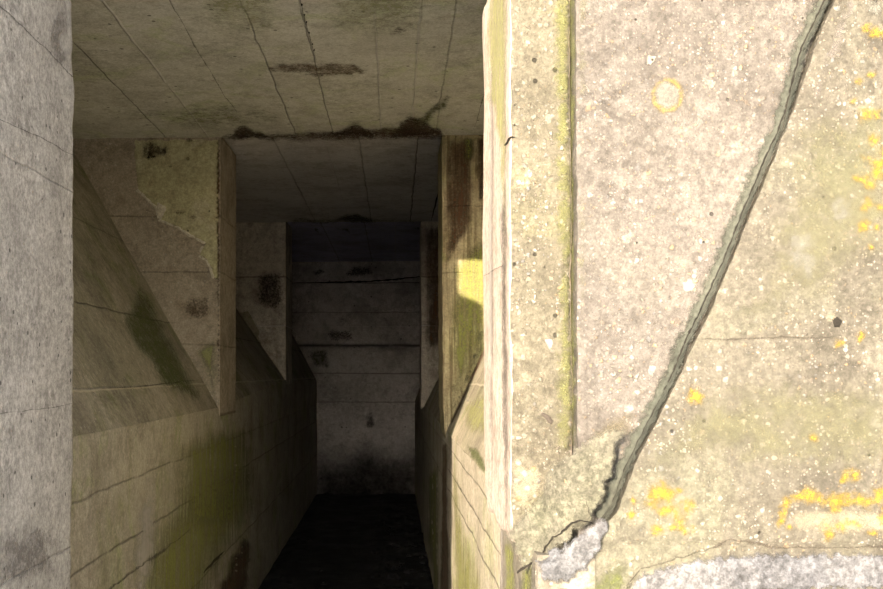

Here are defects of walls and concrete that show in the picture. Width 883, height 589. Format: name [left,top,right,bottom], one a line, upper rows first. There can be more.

damp [270,63,364,77]
damp [143,142,168,160]
peeling [134,139,219,279]
damp [217,99,492,355]
crack [517,0,837,573]